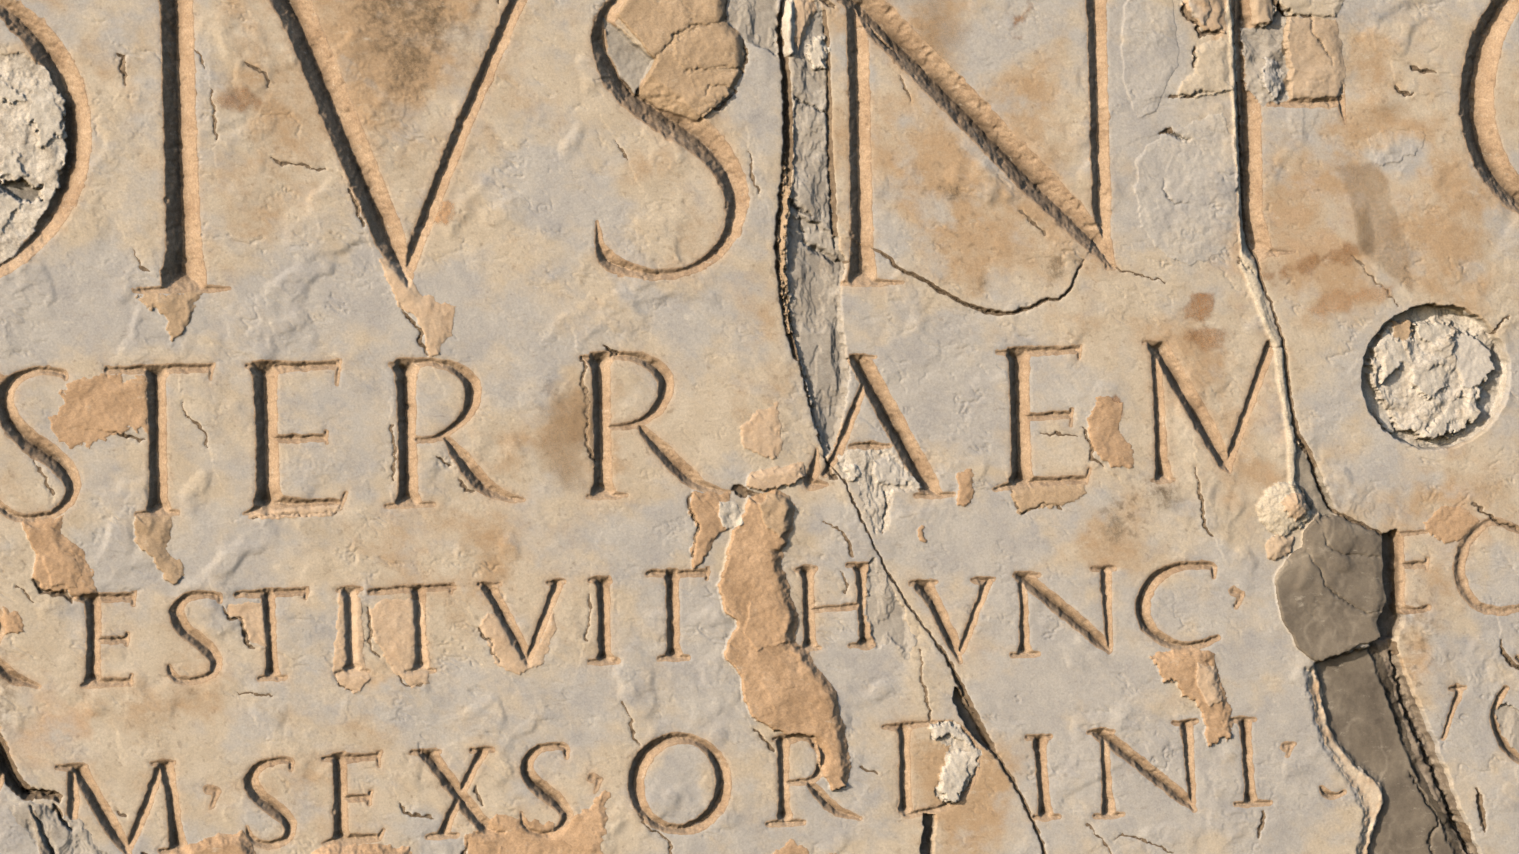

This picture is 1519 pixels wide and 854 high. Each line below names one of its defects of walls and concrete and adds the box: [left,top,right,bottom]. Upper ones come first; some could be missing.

flaking render [1178,0,1346,107]
flaking render [0,52,68,264]
flaking render [603,0,922,534]
flaking render [48,373,153,449]
crack [706,0,1173,854]
crack [1159,0,1487,854]
flaking render [1361,304,1507,449]
crack [15,578,73,604]
flaking render [688,401,852,791]
crack [0,733,63,854]
flaking render [9,800,108,854]
flaking render [929,721,982,803]